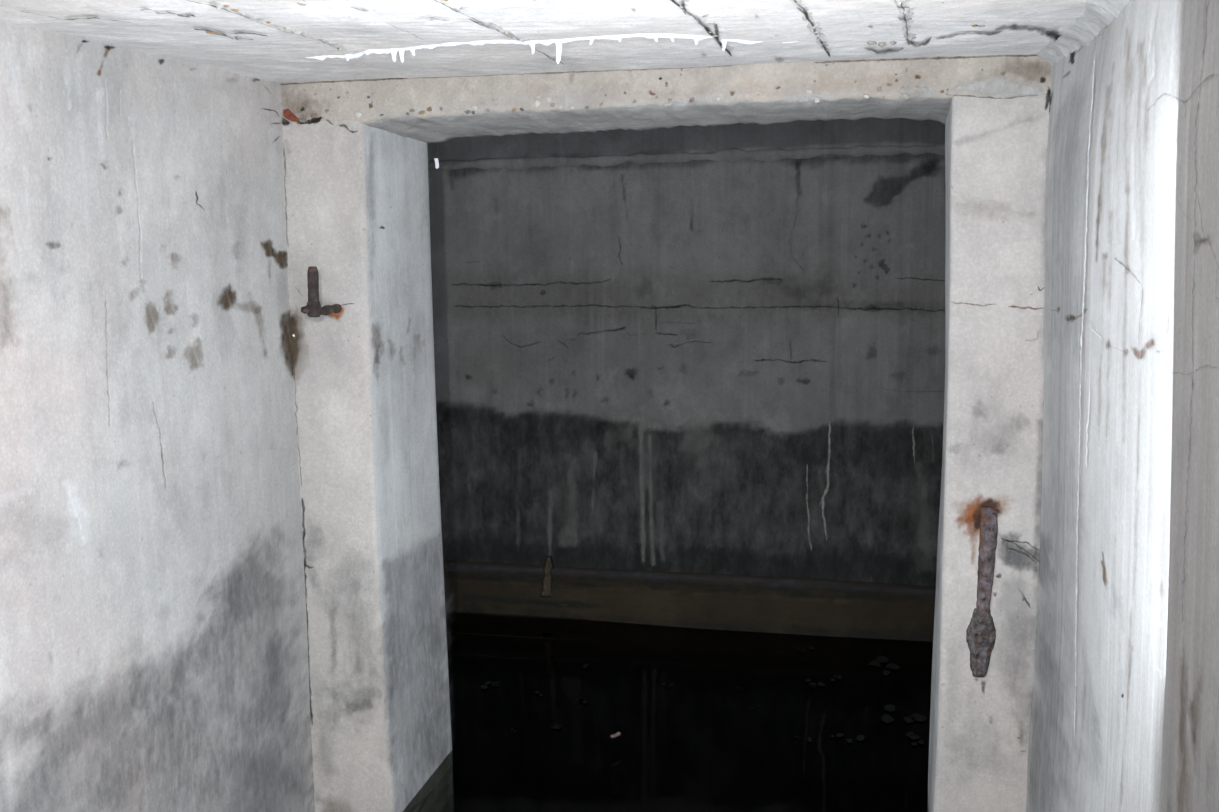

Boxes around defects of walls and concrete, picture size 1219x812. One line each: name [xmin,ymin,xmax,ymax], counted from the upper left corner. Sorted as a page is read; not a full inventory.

crack [188,0,347,52]
crack [436,0,586,74]
water stain [305,33,760,64]
crack [672,0,734,67]
crack [791,0,1062,63]
crack [262,78,408,170]
water stain [436,408,943,597]
corrosion [958,499,1000,534]